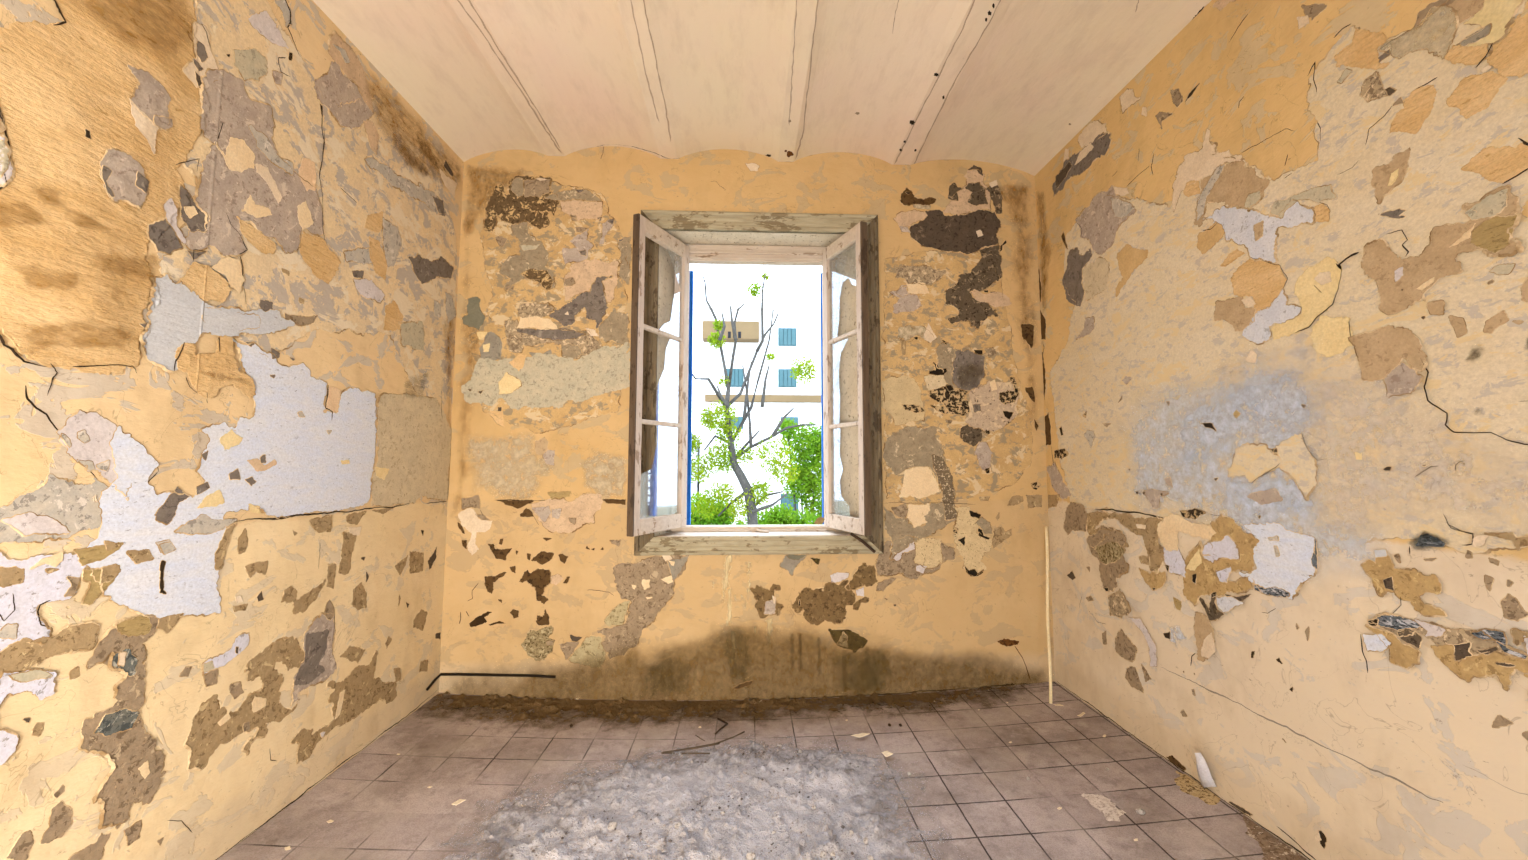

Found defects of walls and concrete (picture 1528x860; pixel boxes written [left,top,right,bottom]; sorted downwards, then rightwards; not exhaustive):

crack [53,0,67,25]
leakage [90,0,192,48]
crack [0,112,13,189]
crack [0,335,137,430]
peeling [0,0,632,860]
peeling [748,0,1528,717]
crack [1422,362,1528,445]
peeling [559,539,689,668]
leakage [464,554,1041,700]
peeling [1491,714,1528,741]
peeling [1166,753,1217,788]
flaking render [1229,790,1327,860]